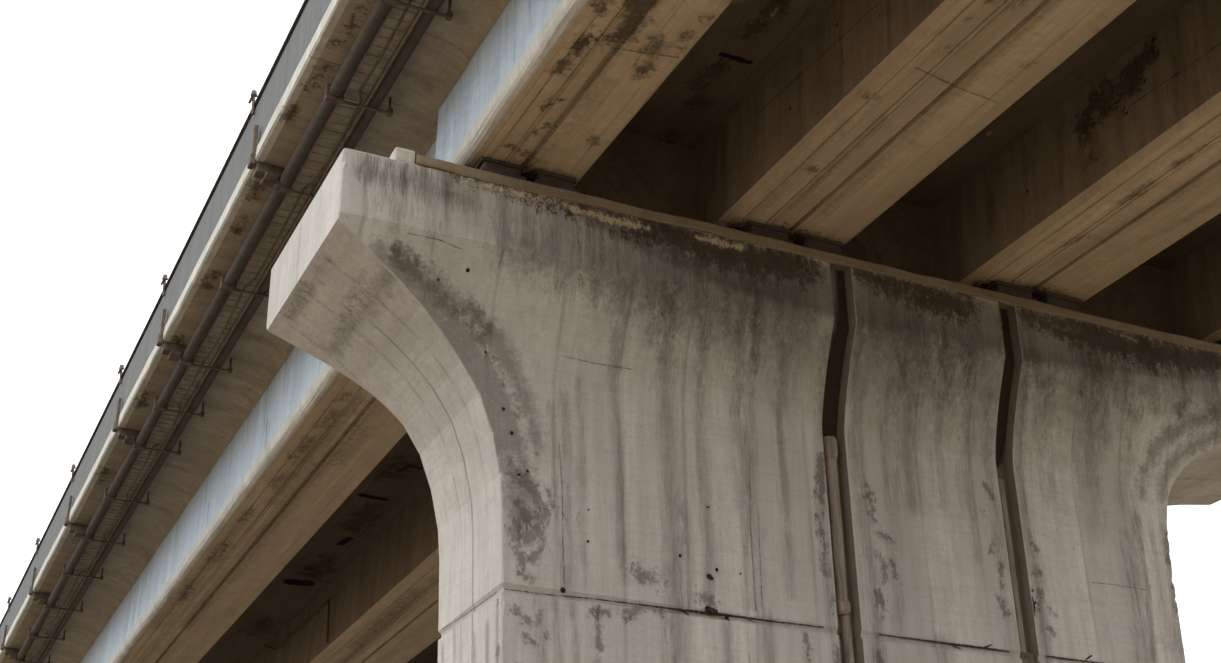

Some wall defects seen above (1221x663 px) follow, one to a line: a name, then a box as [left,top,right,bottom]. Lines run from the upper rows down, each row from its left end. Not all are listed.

damp [450,160,841,290]